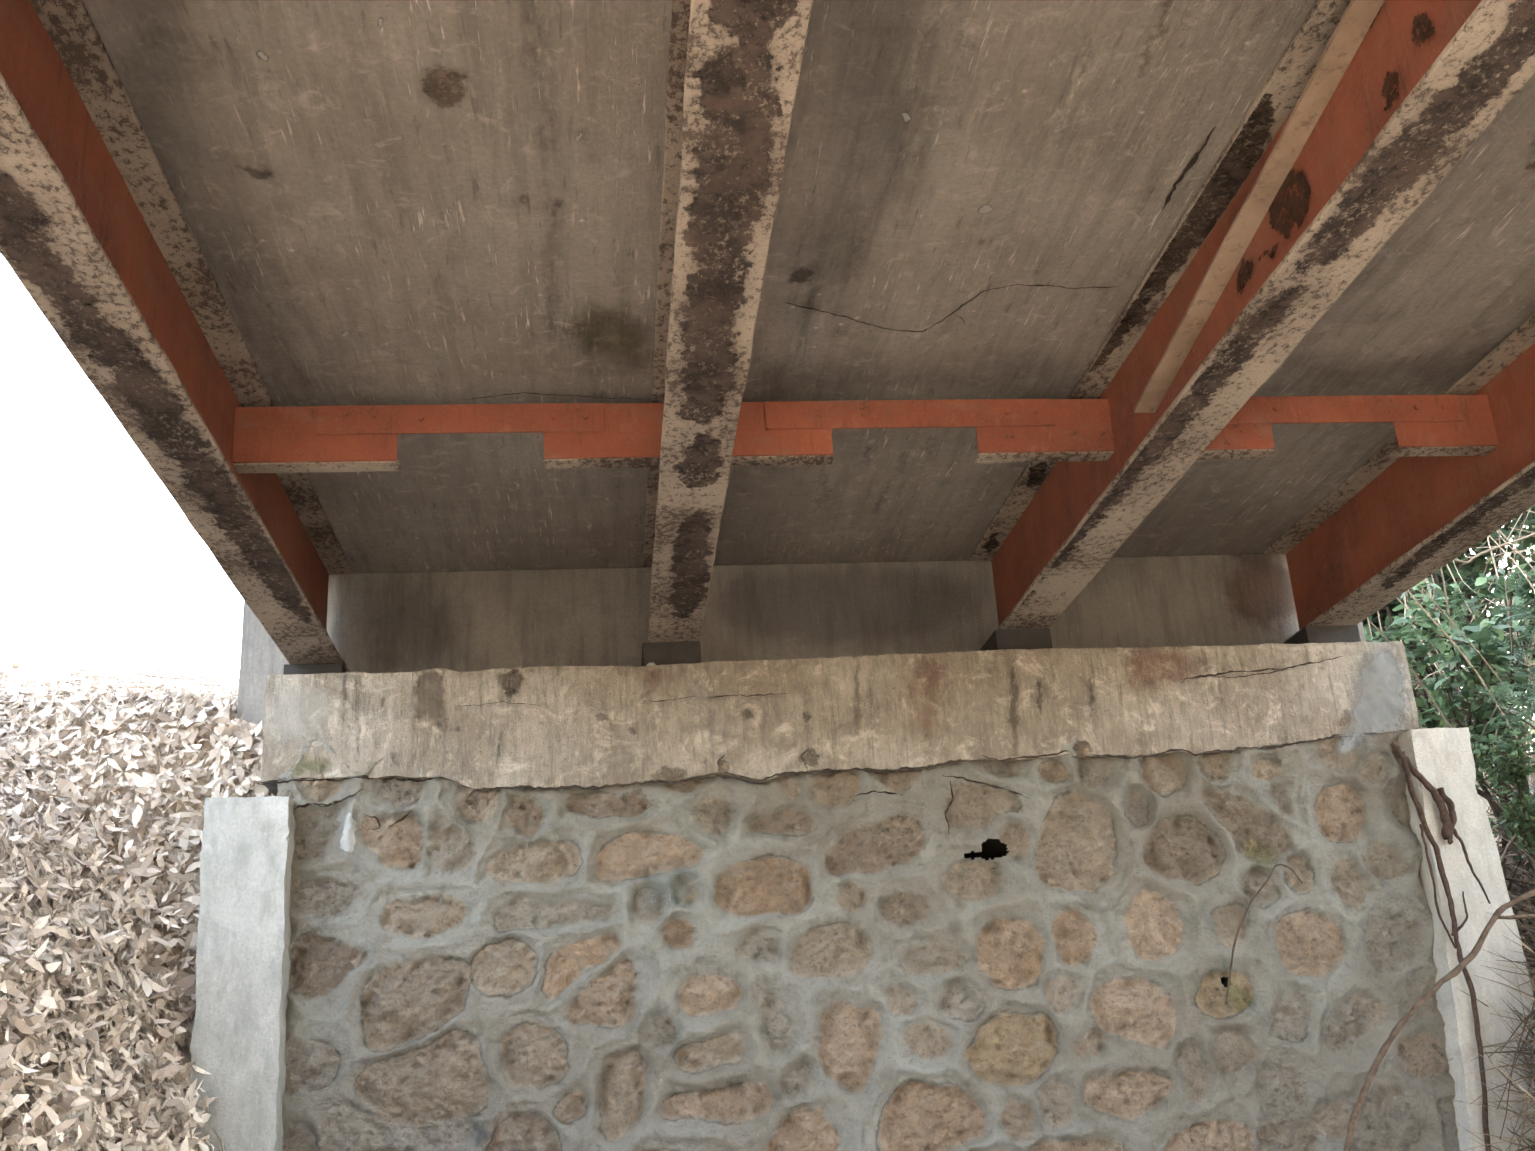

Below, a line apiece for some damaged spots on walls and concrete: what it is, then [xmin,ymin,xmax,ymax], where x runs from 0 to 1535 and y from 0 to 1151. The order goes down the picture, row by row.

crack [1163,126,1216,209]
crack [785,284,1113,332]
rust [1020,0,1535,606]
crack [1182,656,1343,683]
crack [262,775,433,830]
crack [468,734,1344,835]